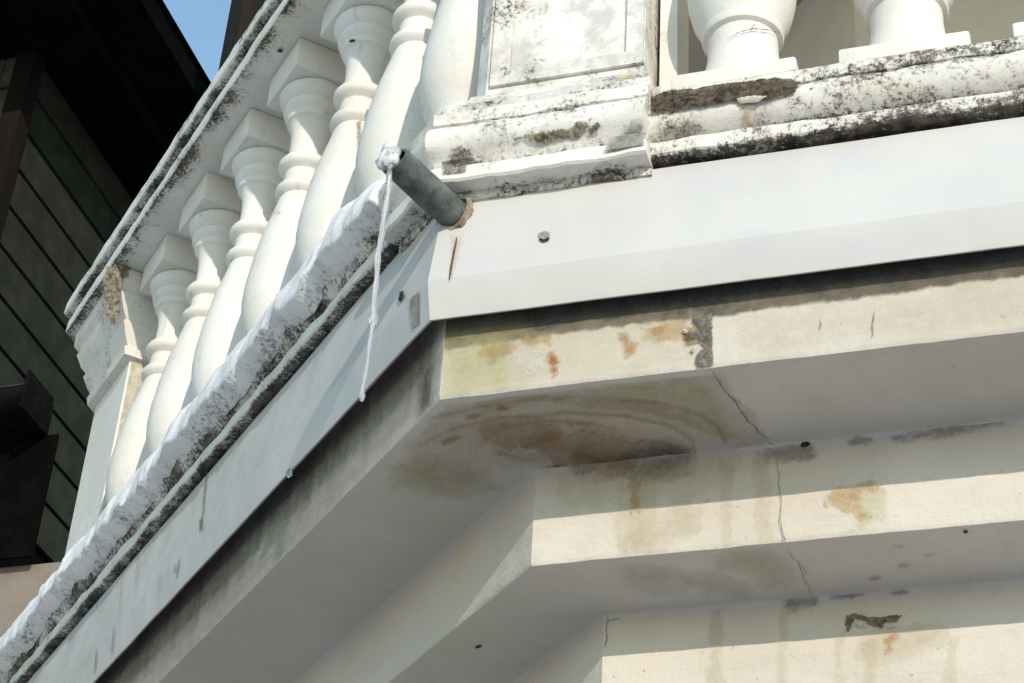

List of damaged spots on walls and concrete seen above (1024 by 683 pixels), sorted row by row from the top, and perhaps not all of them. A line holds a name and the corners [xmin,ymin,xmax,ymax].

spalling [651,77,801,112]
rust [620,333,637,355]
spalling [682,313,714,367]
water stain [428,387,716,475]
crack [713,371,811,595]
peeling [845,613,902,632]